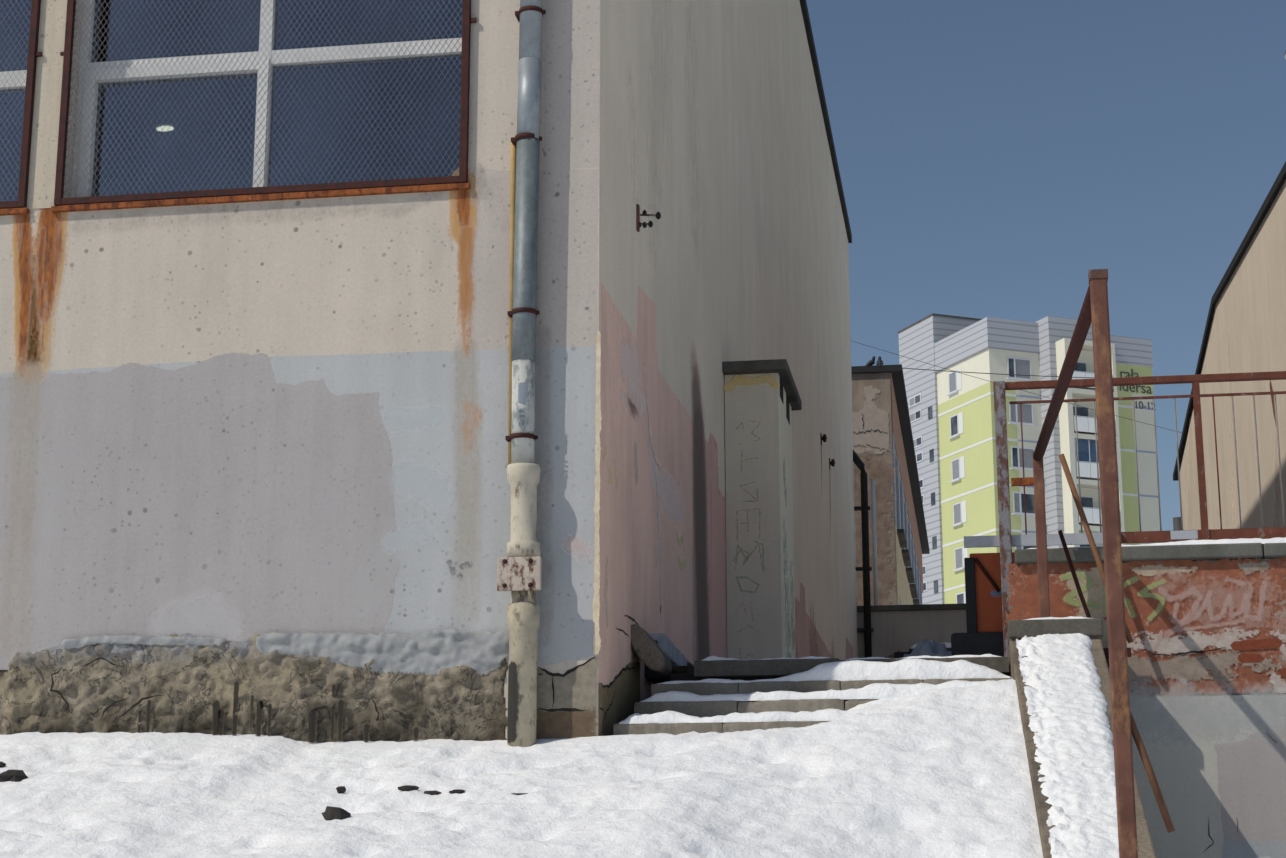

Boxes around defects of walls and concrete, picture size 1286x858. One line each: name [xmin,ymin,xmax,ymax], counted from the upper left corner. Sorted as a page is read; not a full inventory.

rust [13,206,67,383]
rust [449,171,478,355]
flaking render [1005,562,1108,648]
flaking render [1122,557,1286,696]